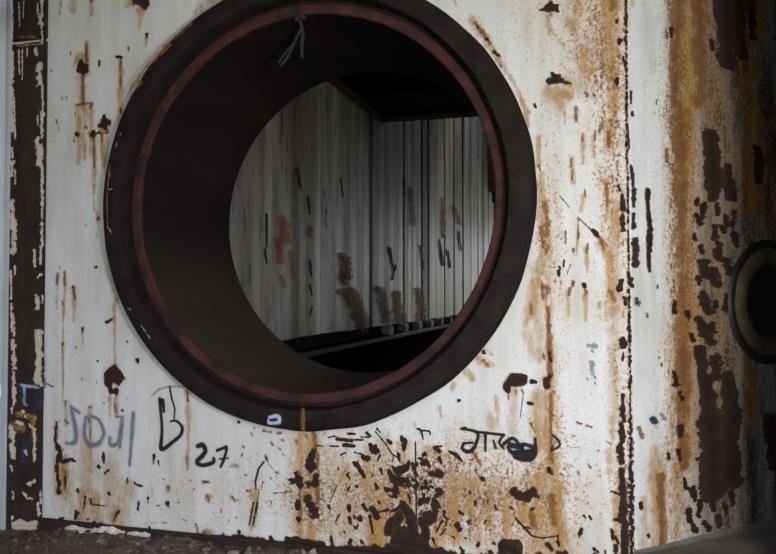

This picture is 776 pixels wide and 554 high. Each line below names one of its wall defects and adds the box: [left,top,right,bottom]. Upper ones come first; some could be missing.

rust [471,20,502,68]
peeling [709,0,758,71]
peeling [9,0,47,279]
rust [540,190,551,256]
rust [564,217,589,257]
peeling [8,265,37,472]
peeling [33,329,45,387]
rust [527,259,588,475]
peeling [683,128,745,534]
peeling [11,479,43,530]
rust [270,408,388,551]
rust [433,475,572,554]